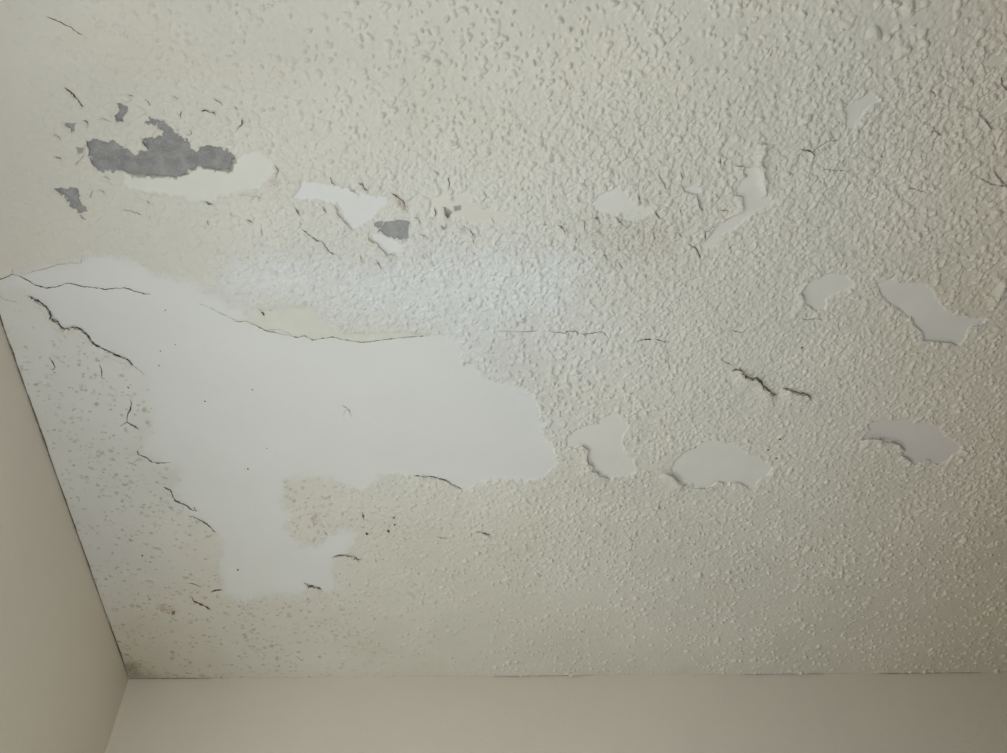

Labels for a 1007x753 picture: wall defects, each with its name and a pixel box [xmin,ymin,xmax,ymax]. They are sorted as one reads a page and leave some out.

crack [63,88,83,108]
spalling [54,95,279,220]
peeling [289,171,511,266]
peeling [680,144,787,259]
crack [724,361,811,401]
crack [0,260,197,679]
crack [163,487,216,533]
crack [188,583,221,610]